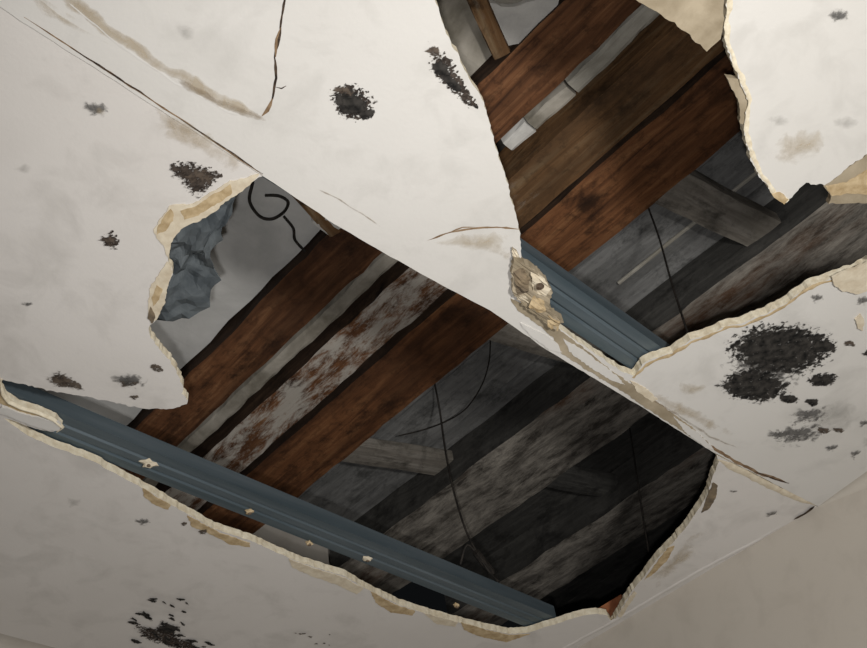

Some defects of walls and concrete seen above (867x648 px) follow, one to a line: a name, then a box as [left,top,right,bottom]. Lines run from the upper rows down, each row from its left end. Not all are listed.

crack [24,17,263,175]
crack [262,0,286,116]
leakage [331,83,376,123]
leakage [425,46,478,109]
leakage [170,161,223,198]
peeling [826,170,867,196]
peeling [831,261,867,294]
leakage [715,321,867,442]
leakage [128,598,215,648]